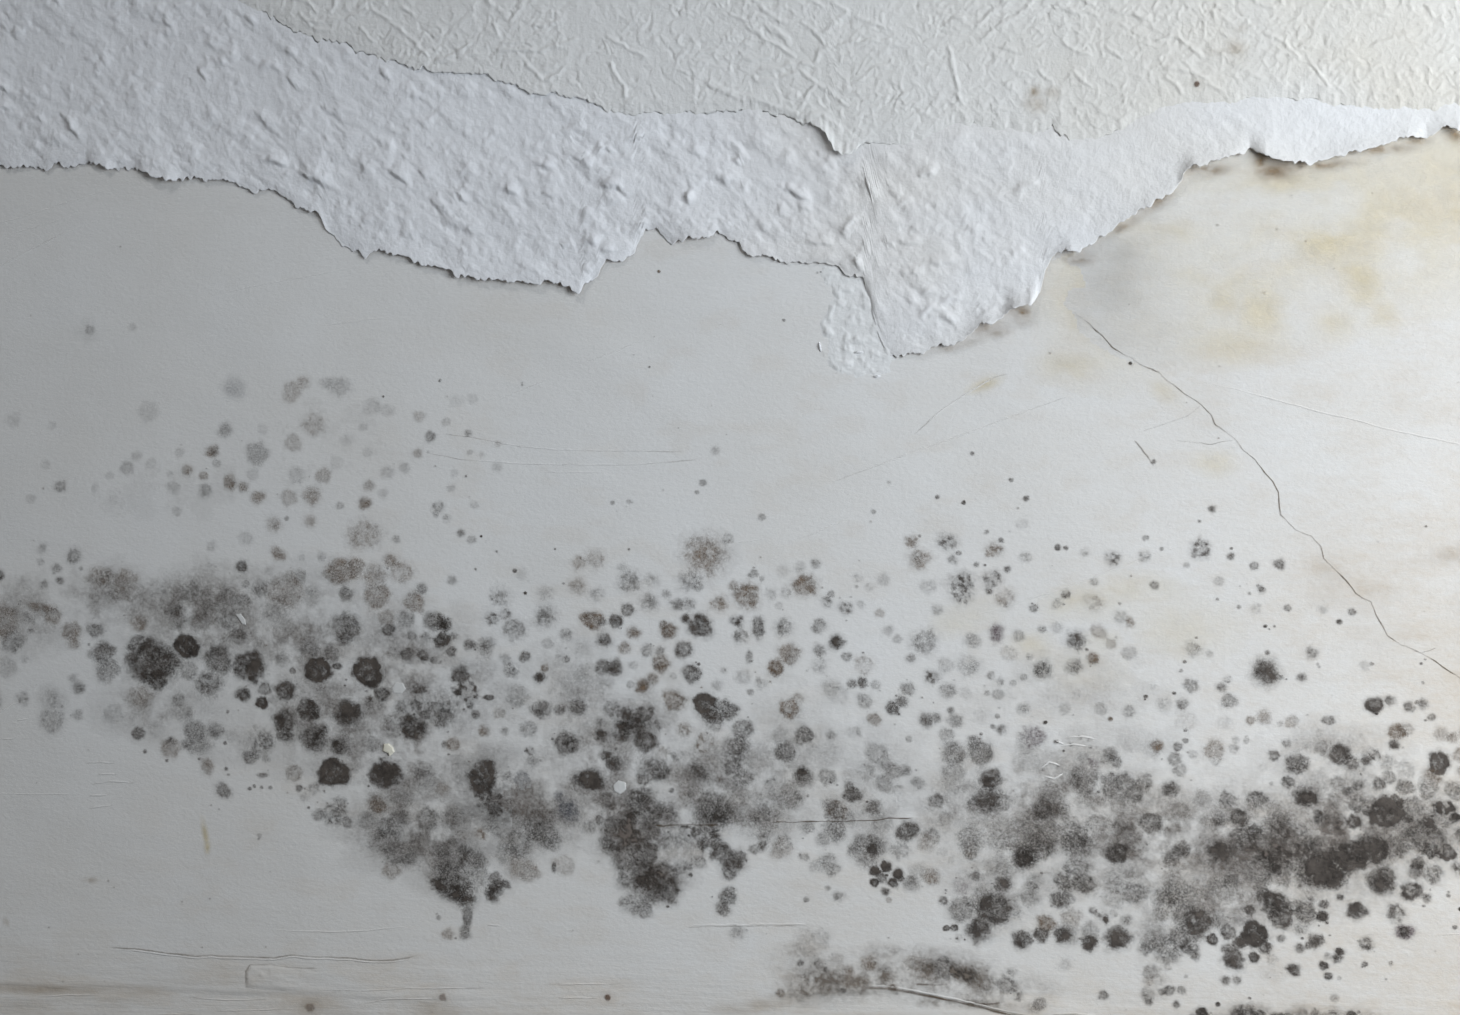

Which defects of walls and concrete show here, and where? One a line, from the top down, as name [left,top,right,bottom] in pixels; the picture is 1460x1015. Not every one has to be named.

leakage [794,562,851,612]
leakage [940,537,1009,601]
leakage [814,620,864,656]
leakage [1068,633,1098,670]
leakage [1254,652,1304,683]
leakage [33,575,798,937]
leakage [776,700,812,780]
leakage [828,782,880,830]
leakage [850,696,1460,984]
leakage [801,962,891,995]
leakage [915,957,1038,1005]
leakage [1196,997,1282,1015]